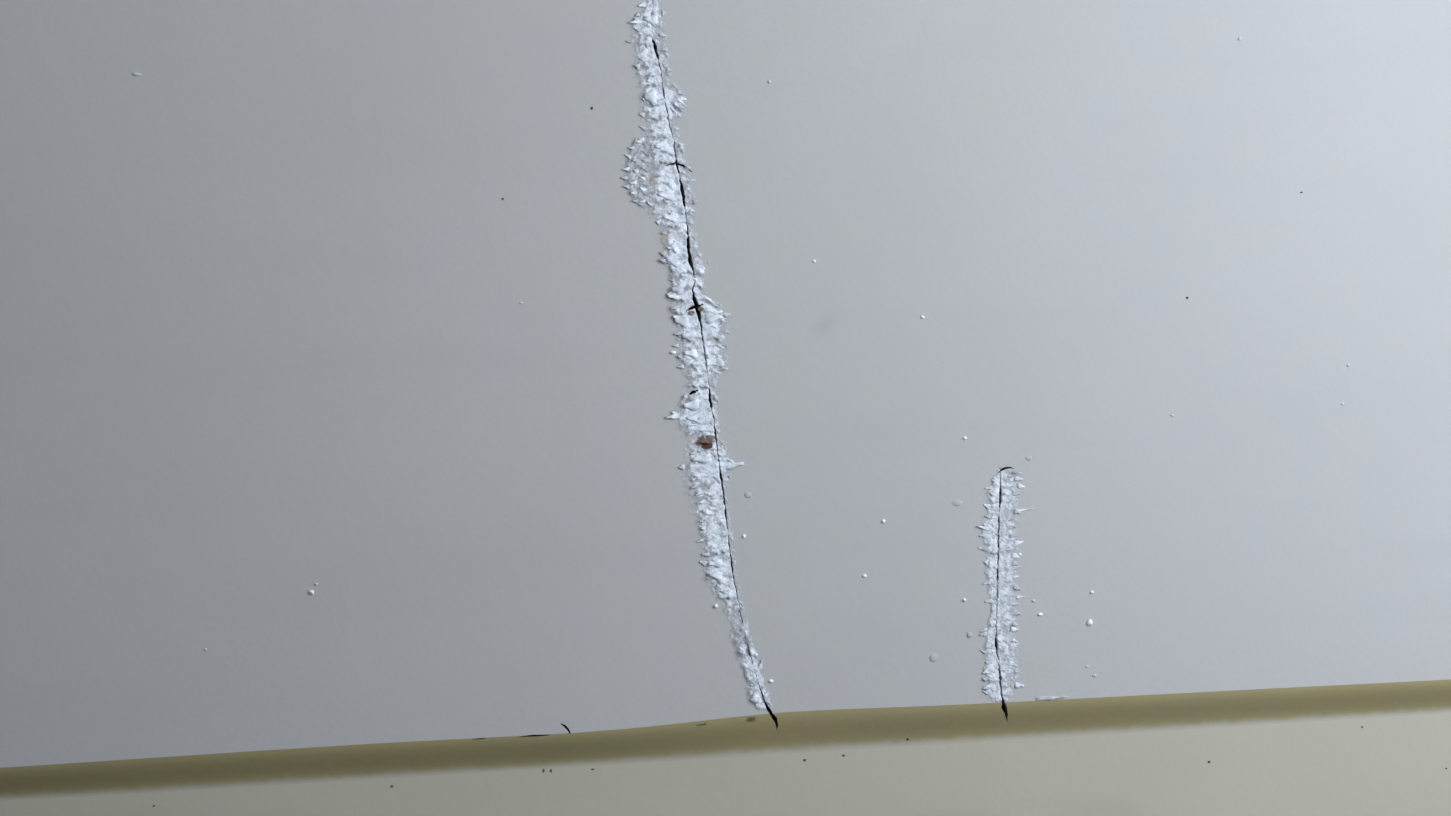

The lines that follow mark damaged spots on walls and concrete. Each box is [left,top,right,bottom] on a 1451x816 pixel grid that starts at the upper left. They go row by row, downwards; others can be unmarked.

crack [652,38,778,729]
crack [995,467,1014,723]